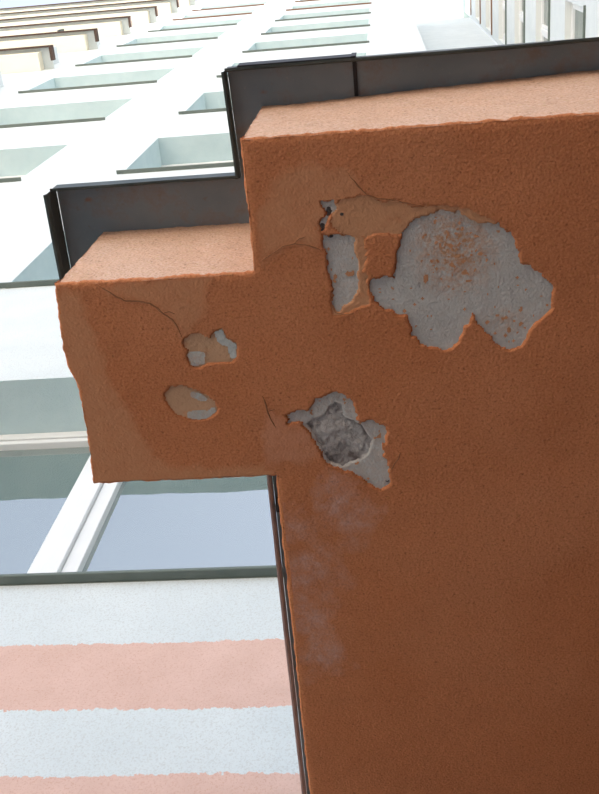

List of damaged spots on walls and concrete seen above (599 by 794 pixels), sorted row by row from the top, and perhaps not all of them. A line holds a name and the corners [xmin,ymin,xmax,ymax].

crack [99,286,181,334]
peeling [57,277,390,489]
peeling [255,158,553,350]